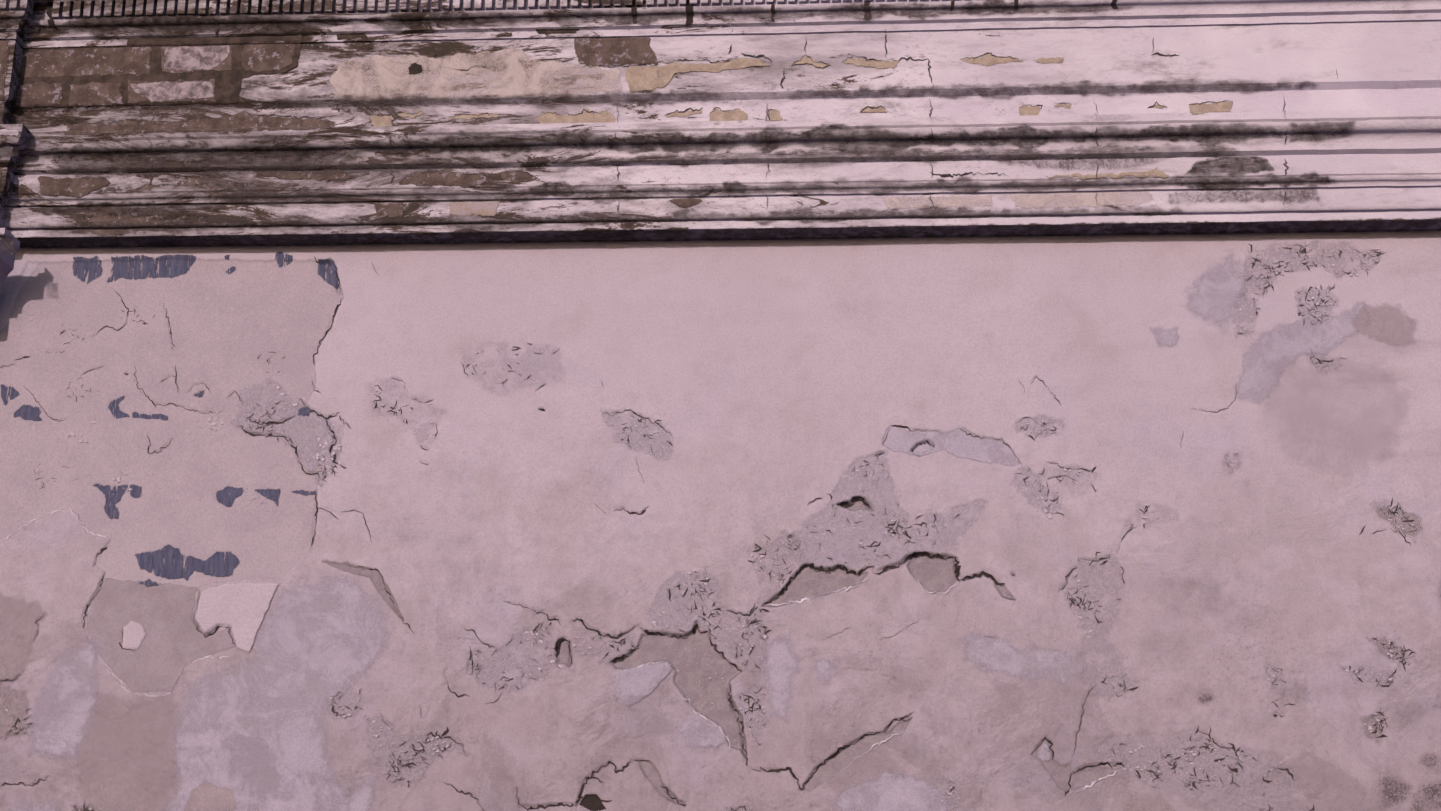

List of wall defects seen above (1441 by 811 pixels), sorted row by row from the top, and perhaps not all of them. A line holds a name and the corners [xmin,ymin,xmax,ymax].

flaking render [0,34,335,135]
peeling [330,29,772,126]
damp [53,122,1353,202]
damp [32,202,217,216]
crack [593,462,649,515]
peeling [0,252,463,811]
crack [504,601,641,639]
spalling [467,425,1097,792]
crack [381,629,503,753]
crack [1071,687,1093,760]
spalling [516,778,612,811]
crack [586,759,633,782]